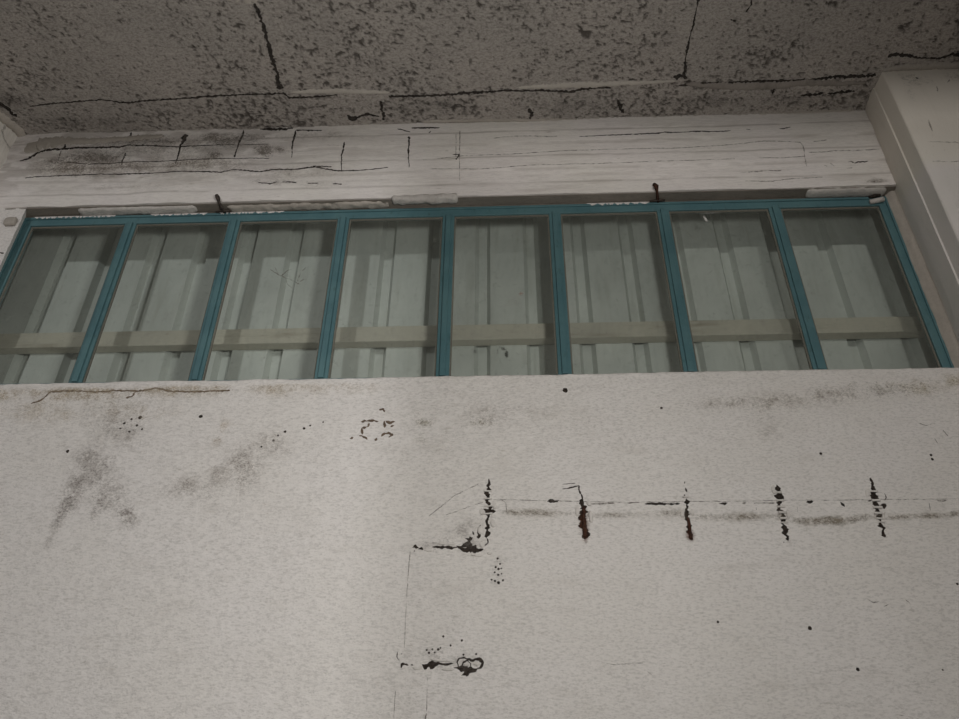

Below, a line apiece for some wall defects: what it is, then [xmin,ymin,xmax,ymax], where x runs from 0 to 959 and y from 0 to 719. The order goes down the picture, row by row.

crack [673,73,687,81]
crack [888,52,959,79]
crack [801,89,855,97]
crack [0,102,17,117]
crack [20,100,876,185]
crack [429,484,946,516]